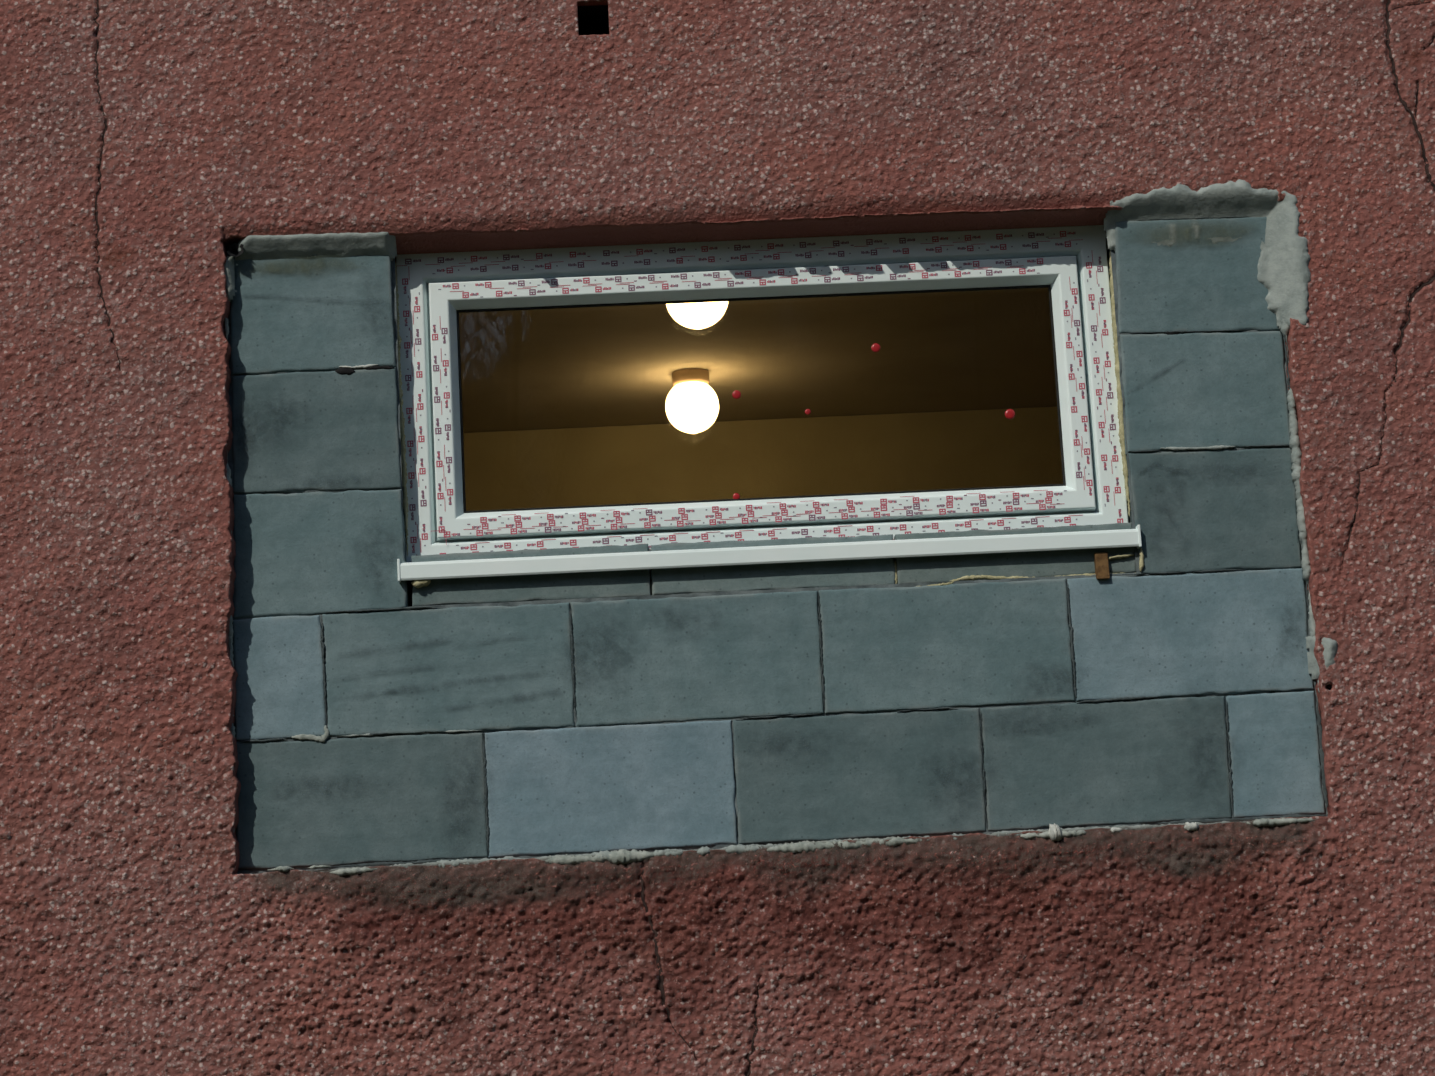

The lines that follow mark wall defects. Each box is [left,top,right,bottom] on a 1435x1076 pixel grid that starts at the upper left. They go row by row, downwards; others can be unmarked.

crack [94,0,120,370]
crack [1386,0,1435,191]
crack [1342,276,1435,567]
crack [639,867,697,1059]
crack [746,975,762,1076]